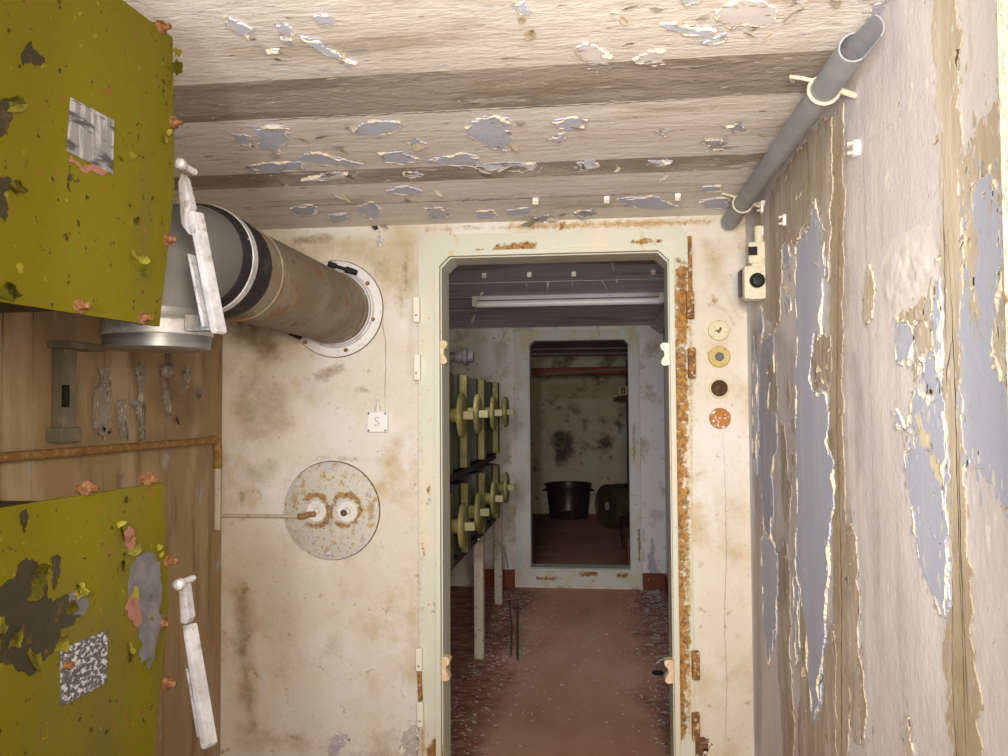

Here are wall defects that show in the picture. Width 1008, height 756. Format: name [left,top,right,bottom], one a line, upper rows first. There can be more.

peeling [574,37,619,69]
peeling [622,42,672,67]
peeling [650,0,889,46]
peeling [230,123,391,249]
peeling [378,115,542,221]
corrosion [476,241,536,250]
peeling [475,207,597,226]
spalling [861,264,876,330]
spalling [891,0,1008,756]
damp [554,431,572,461]
peeling [751,95,873,756]
corrosion [675,258,713,756]